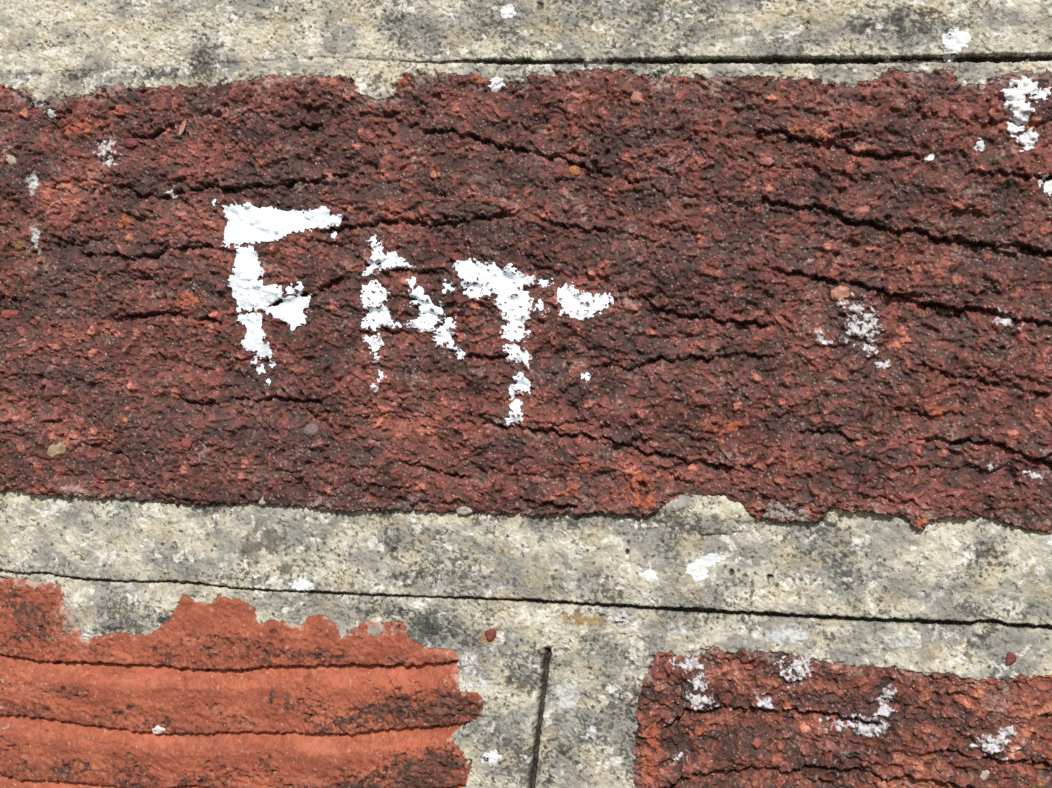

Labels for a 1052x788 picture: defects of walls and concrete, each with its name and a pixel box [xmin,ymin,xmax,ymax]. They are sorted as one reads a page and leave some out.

crack [0,569,1052,629]